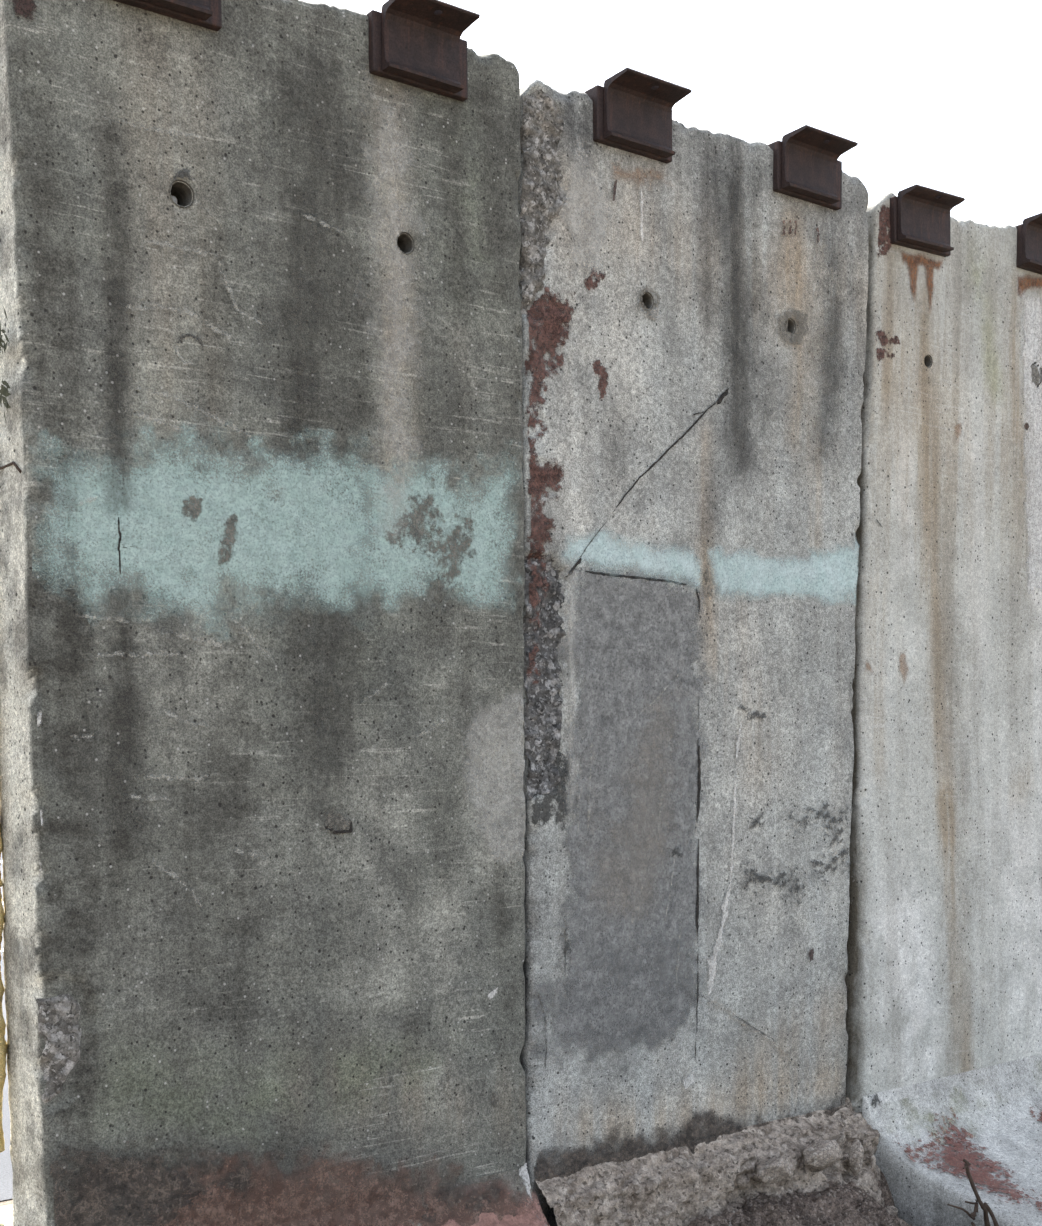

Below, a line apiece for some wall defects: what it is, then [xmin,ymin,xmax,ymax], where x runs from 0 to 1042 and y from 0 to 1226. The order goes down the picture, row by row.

corrosion [12,0,37,20]
spalling [519,89,567,315]
corrosion [878,204,942,304]
corrosion [1018,276,1042,297]
corrosion [592,360,608,399]
corrosion [876,330,901,361]
peeling [388,478,475,591]
corrosion [525,267,605,684]
crack [564,388,729,578]
spalling [523,553,566,802]
water stain [532,750,574,830]
crack [695,703,710,1056]